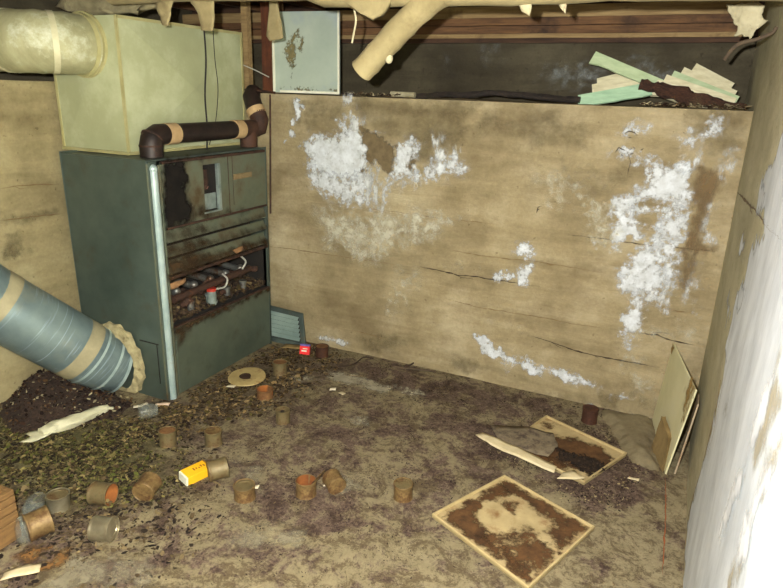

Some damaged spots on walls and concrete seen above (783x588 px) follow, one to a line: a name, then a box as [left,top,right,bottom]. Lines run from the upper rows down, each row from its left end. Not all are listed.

leakage [683,117,723,144]
leakage [304,95,467,260]
leakage [592,123,735,350]
crack [270,246,540,287]
leakage [474,333,591,386]
crack [533,336,660,368]
crack [642,332,692,345]